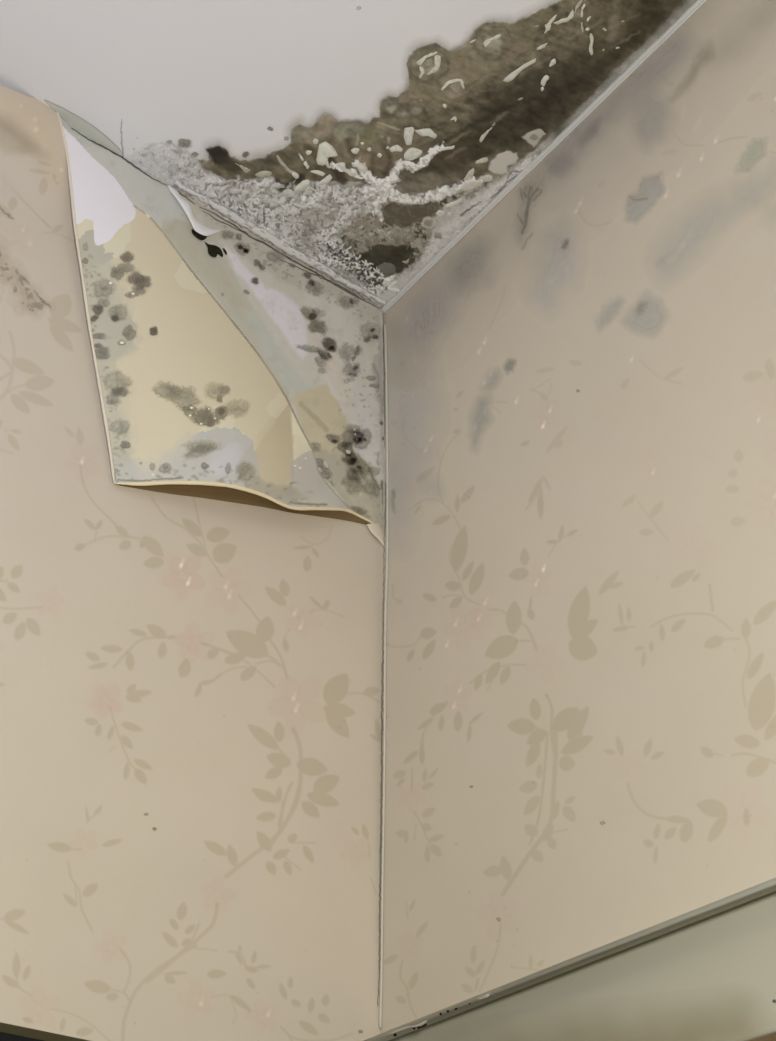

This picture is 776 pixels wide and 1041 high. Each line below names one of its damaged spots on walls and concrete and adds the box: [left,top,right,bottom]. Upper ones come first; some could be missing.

water stain [138,0,692,308]
mould [0,253,46,311]
mould [91,252,150,359]
peeling [45,100,384,527]
water stain [298,308,379,387]
mould [104,372,131,404]
mould [154,384,248,426]
mould [112,421,130,448]
mould [187,441,216,469]
mould [226,463,254,480]
mould [311,421,384,495]